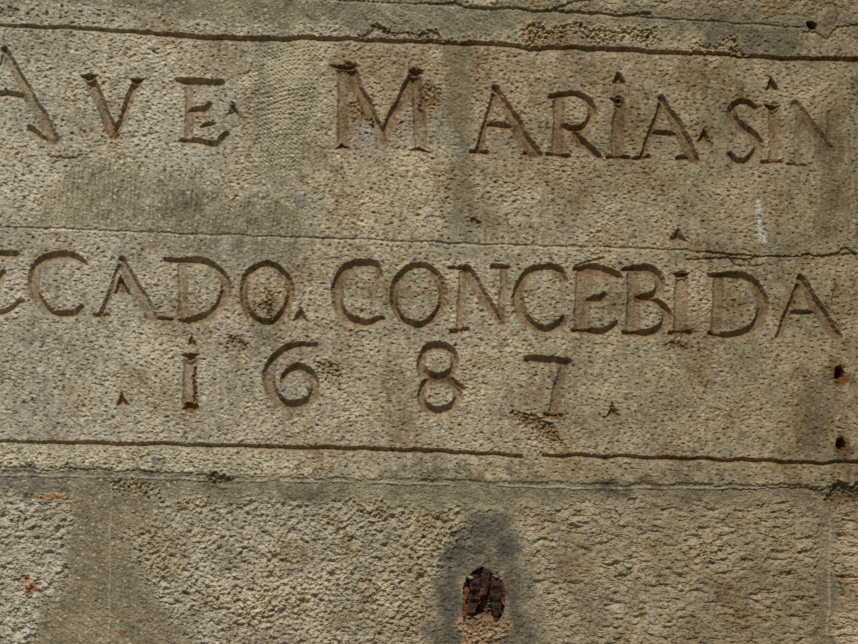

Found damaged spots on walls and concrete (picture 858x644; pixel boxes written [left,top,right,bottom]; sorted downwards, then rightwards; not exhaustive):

spalling [458,610,512,644]